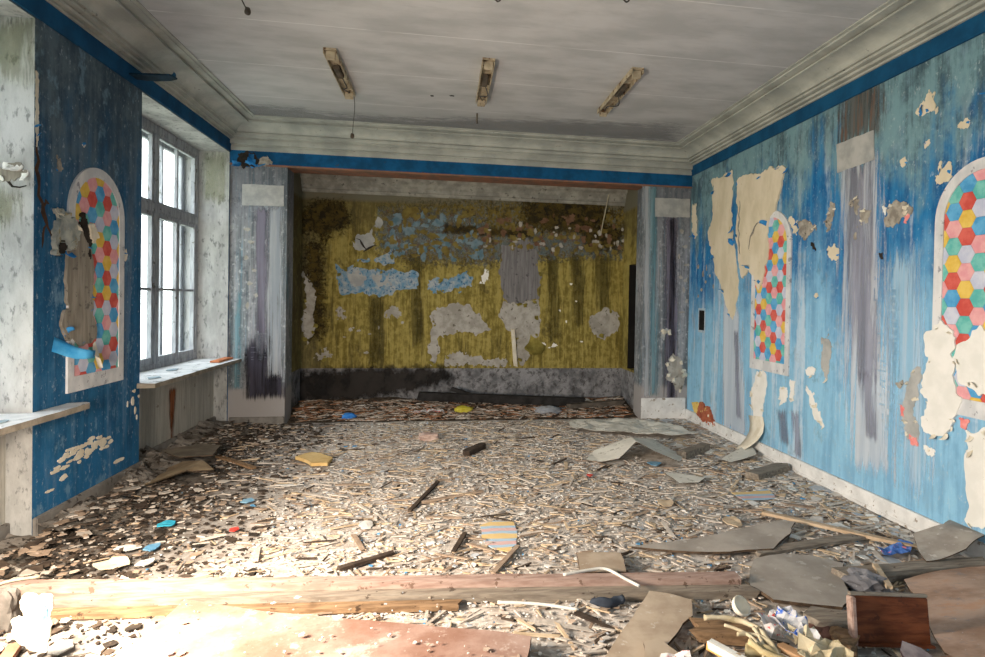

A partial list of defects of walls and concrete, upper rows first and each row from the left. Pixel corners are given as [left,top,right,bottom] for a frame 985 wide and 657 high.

peeling [51,229,103,368]
water stain [234,207,285,399]
water stain [302,198,352,345]
peeling [335,199,624,368]
peeling [655,165,788,320]
flaking render [788,202,839,261]
flaking render [848,196,914,240]
peeling [45,435,113,493]
water stain [300,365,456,400]
peeling [736,371,767,450]
peeling [778,333,832,430]
peeling [895,320,985,529]